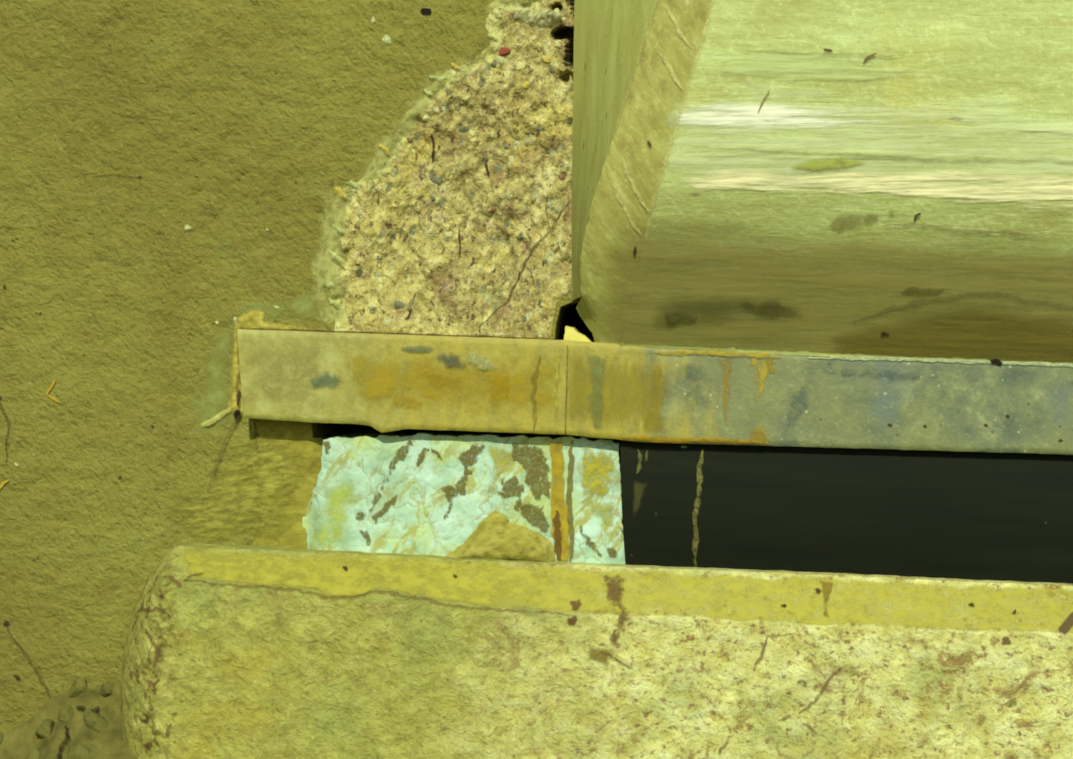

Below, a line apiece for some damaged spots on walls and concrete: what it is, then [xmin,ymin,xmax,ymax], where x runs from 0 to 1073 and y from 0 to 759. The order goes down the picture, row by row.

spalling [312,0,574,339]
spalling [564,326,593,342]
leakage [616,233,1073,362]
corrosion [654,349,775,410]
crack [0,396,16,465]
corrosion [620,415,767,445]
peeling [356,438,442,545]
peeling [442,444,485,519]
peeling [499,443,551,532]
peeling [580,526,618,558]
crack [3,621,51,698]